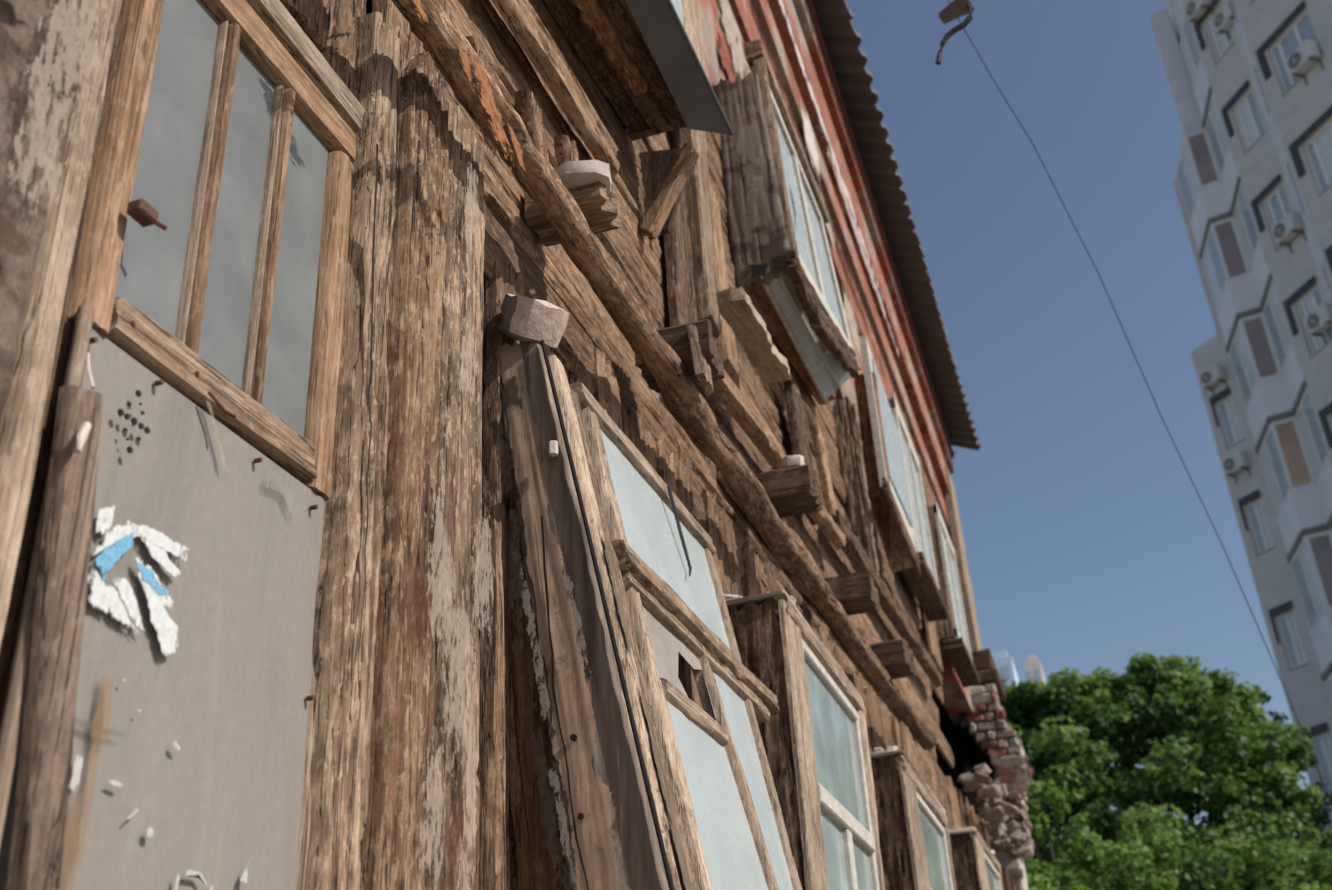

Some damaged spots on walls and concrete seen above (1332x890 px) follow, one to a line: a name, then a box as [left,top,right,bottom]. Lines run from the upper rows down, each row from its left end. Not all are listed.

peeling [8,0,107,224]
peeling [0,212,33,257]
peeling [464,152,479,260]
peeling [458,318,479,404]
peeling [416,374,577,890]
peeling [563,576,592,679]
spalling [967,684,1035,888]
peeling [608,827,631,890]